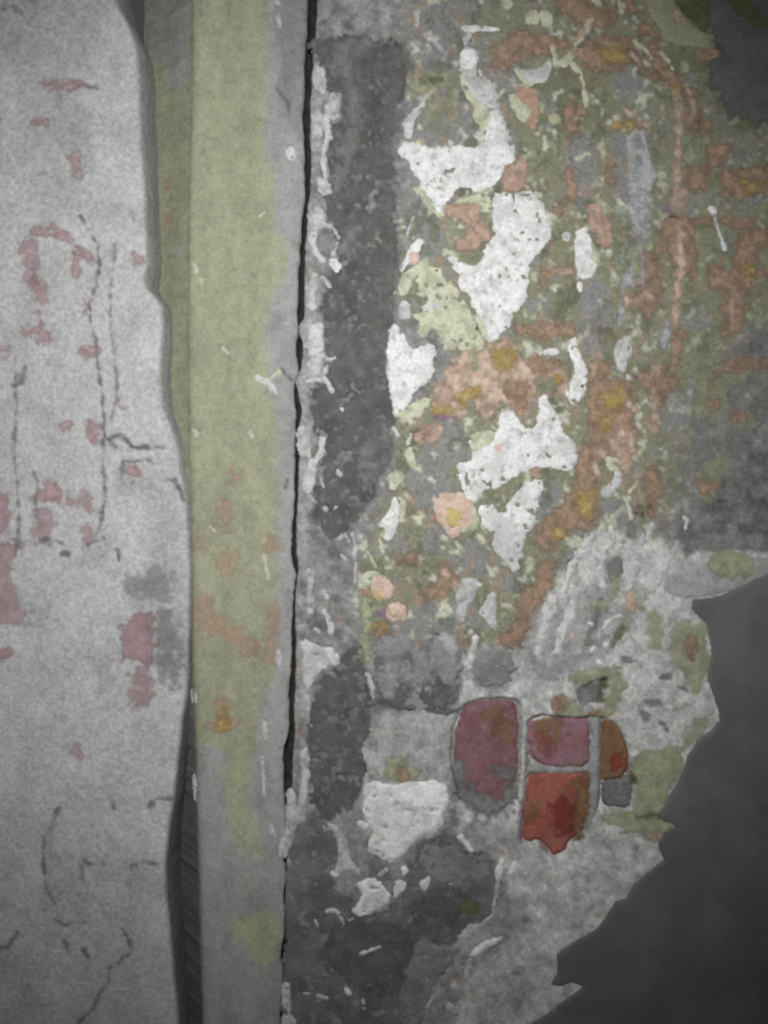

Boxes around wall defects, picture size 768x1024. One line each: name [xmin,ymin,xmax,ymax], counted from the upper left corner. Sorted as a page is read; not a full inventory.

peeling [632,0,719,70]
crack [16,215,158,560]
crack [171,478,185,501]
crack [276,0,317,825]
spalling [296,25,600,600]
peeling [601,430,640,520]
peeling [614,338,632,380]
corrosion [489,0,768,650]
peeling [268,522,768,1024]
corrosion [551,694,566,718]
crack [42,856,132,1023]
crack [279,857,287,1024]